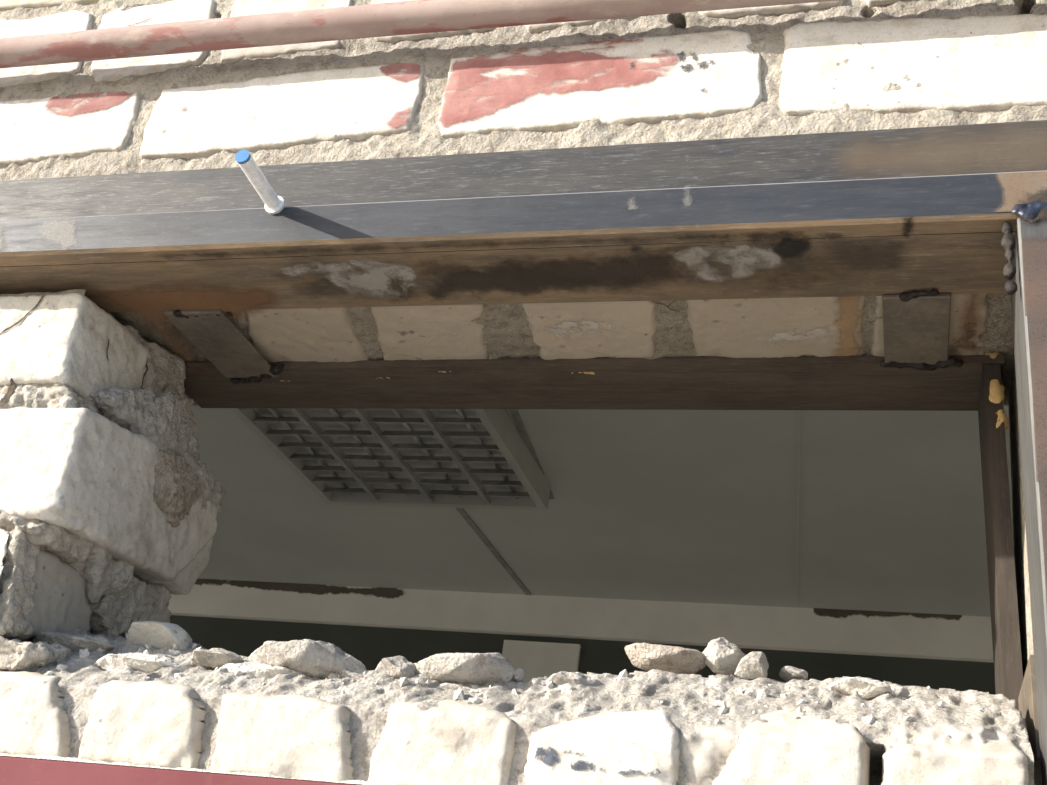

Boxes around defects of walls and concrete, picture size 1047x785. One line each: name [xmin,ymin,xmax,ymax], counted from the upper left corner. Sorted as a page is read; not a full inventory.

crack [0,296,43,335]
corrosion [1022,239,1047,608]